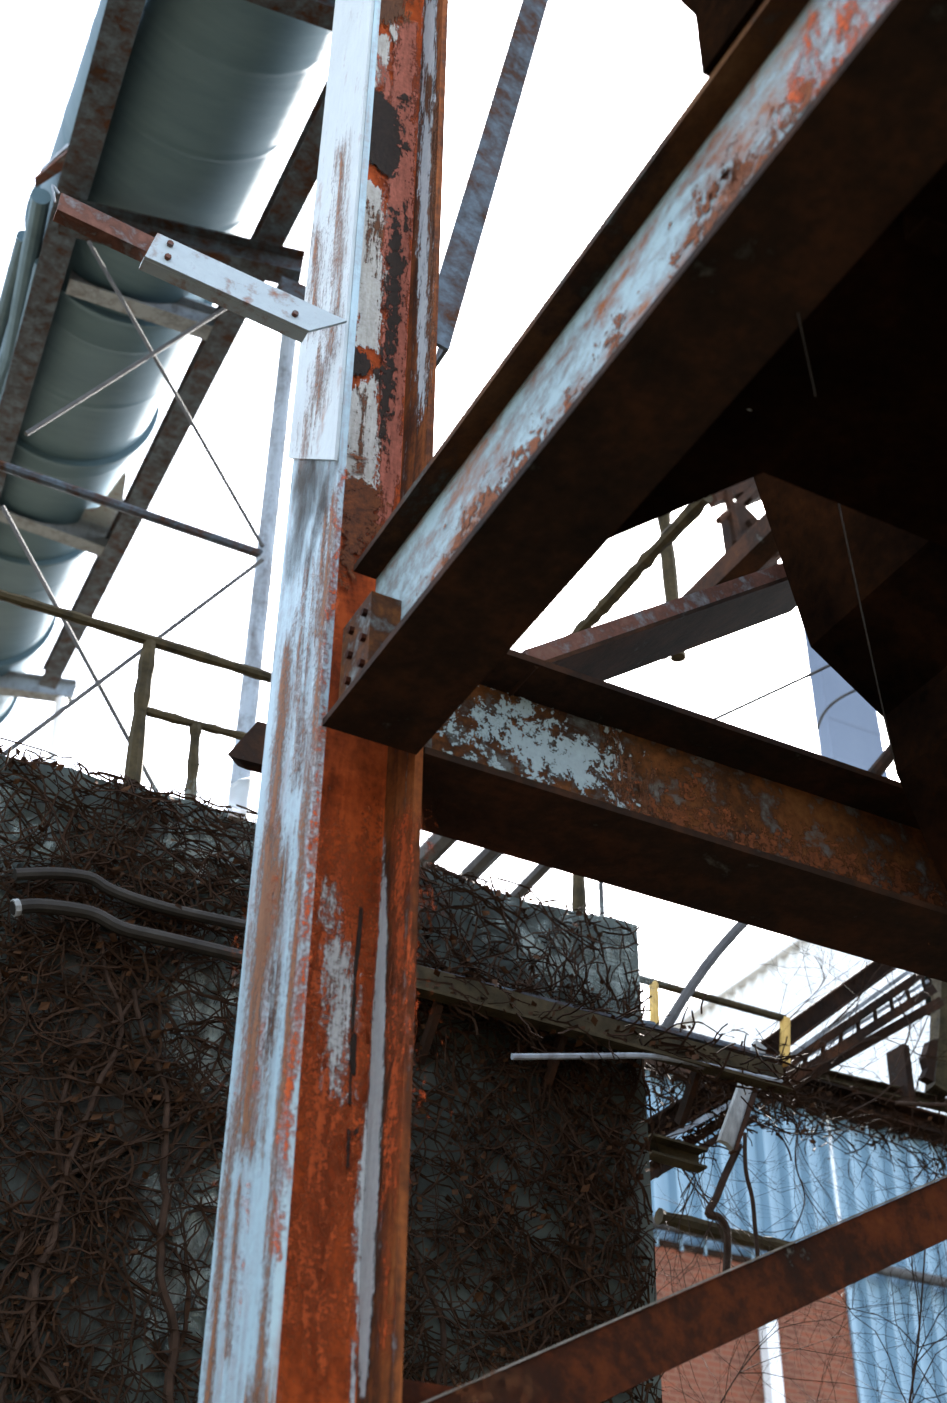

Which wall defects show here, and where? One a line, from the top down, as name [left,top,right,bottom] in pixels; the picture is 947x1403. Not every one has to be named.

corrosion [416,0,891,596]
corrosion [204,20,439,1403]
peeling [437,686,645,809]
peeling [316,838,388,1403]